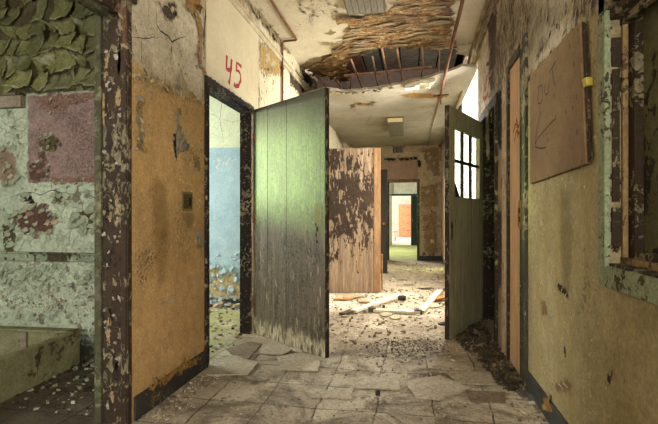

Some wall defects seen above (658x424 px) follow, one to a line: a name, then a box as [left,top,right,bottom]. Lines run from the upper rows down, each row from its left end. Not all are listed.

crack [133,5,206,65]
spalling [245,0,476,95]
peeling [102,1,206,223]
peeling [0,131,94,187]
peeling [0,192,58,252]
peeling [68,202,94,237]
peeling [102,230,121,269]
peeling [210,252,240,302]
peeling [101,287,121,412]